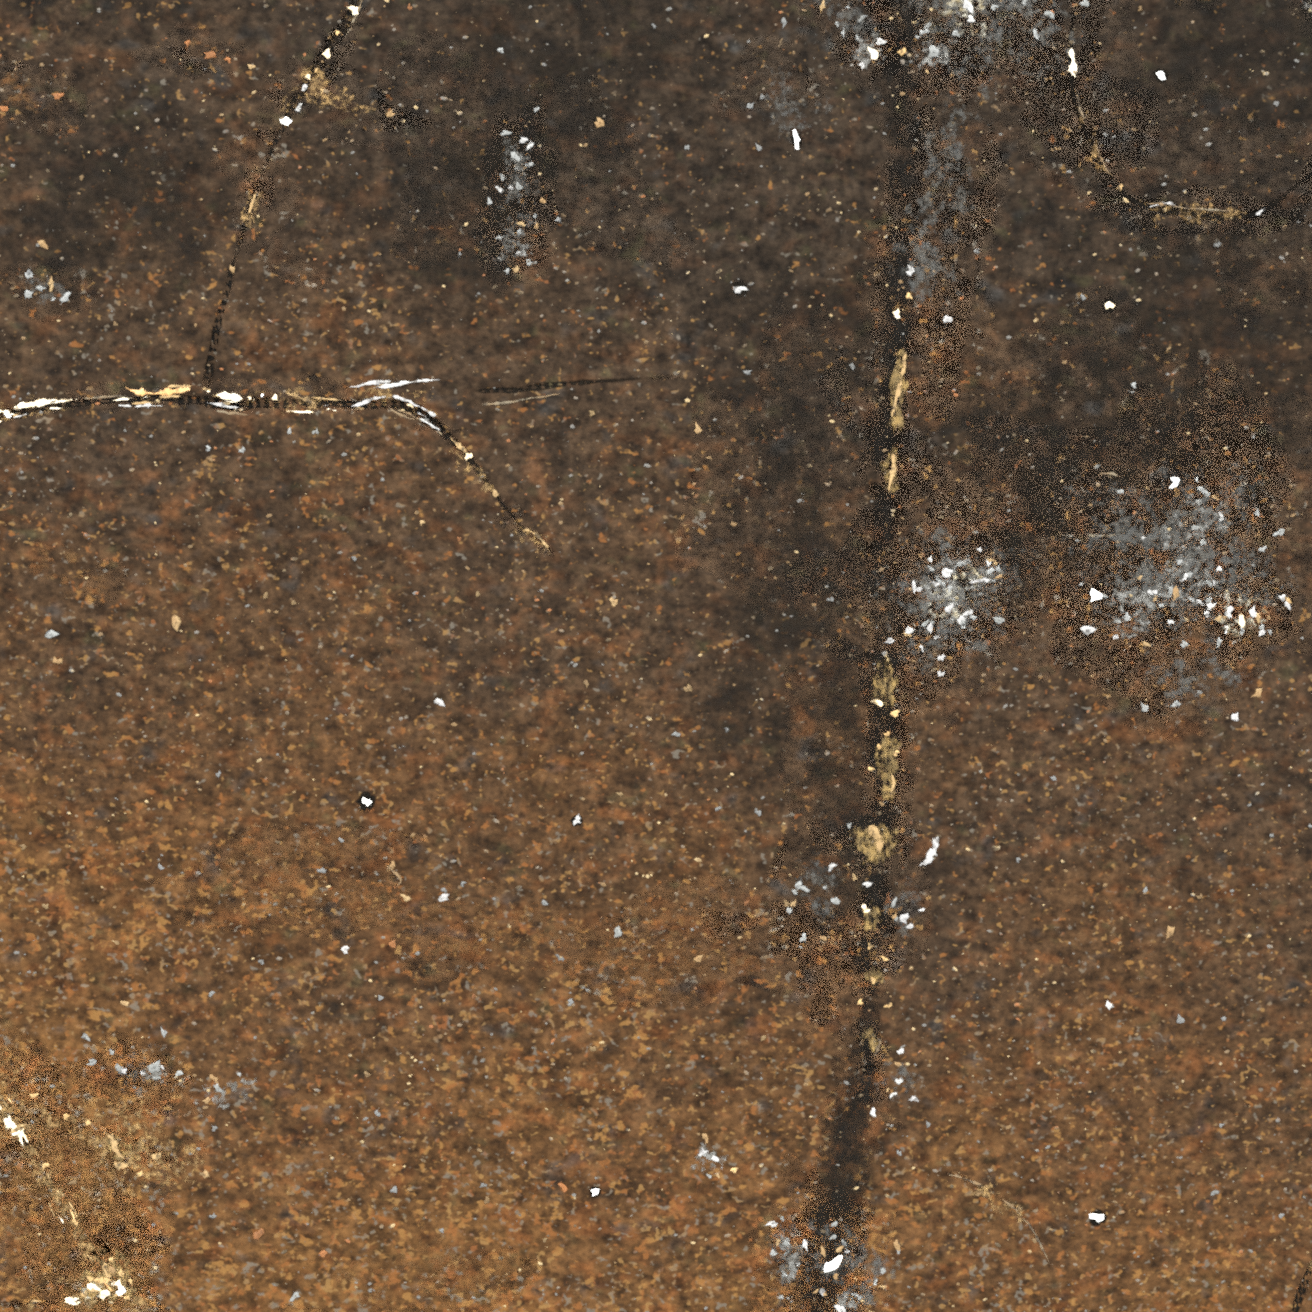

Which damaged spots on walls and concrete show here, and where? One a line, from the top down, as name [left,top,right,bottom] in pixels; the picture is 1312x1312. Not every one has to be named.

corrosion [0,77,32,112]
corrosion [184,40,231,63]
crack [267,0,395,161]
leakage [909,0,1065,74]
crack [0,258,548,548]
crack [478,379,631,406]
corrosion [172,615,181,631]
corrosion [387,861,501,954]
leakage [786,862,841,914]
leakage [883,1048,919,1102]
crack [0,1070,203,1312]
leakage [764,1216,900,1312]